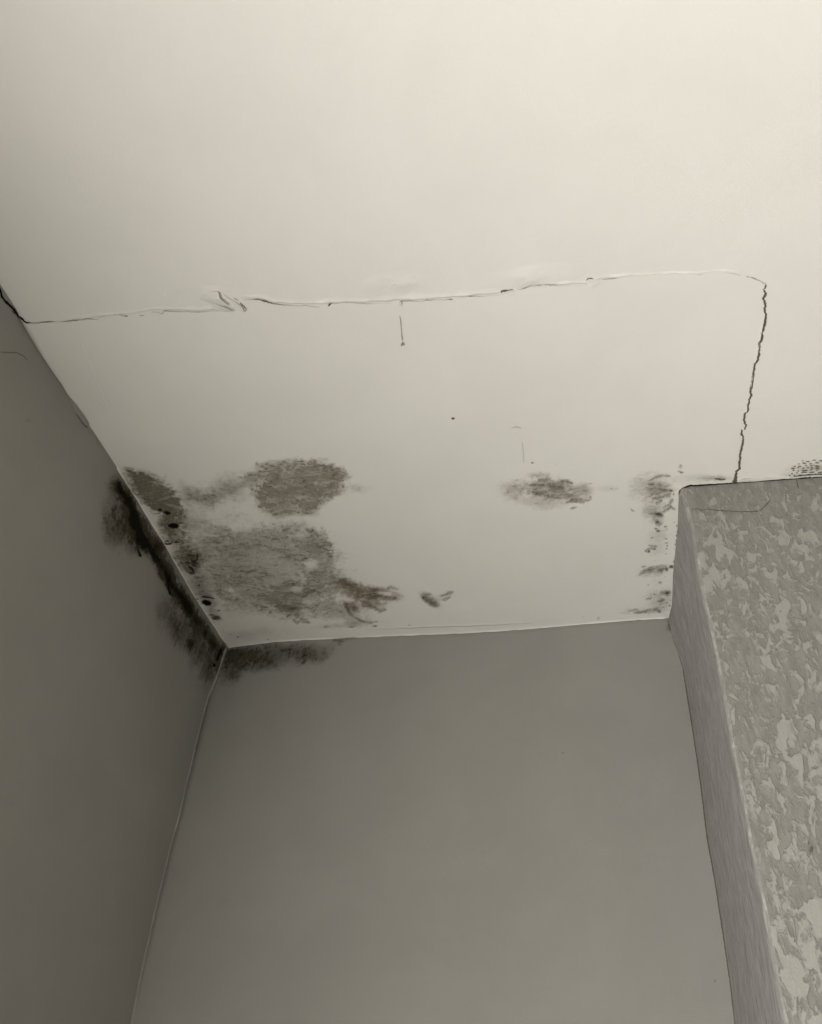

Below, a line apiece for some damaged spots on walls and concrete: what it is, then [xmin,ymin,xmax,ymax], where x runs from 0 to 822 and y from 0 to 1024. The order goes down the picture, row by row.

water stain [103,460,396,681]
crack [0,269,819,512]
water stain [532,478,587,504]
water stain [641,475,672,532]